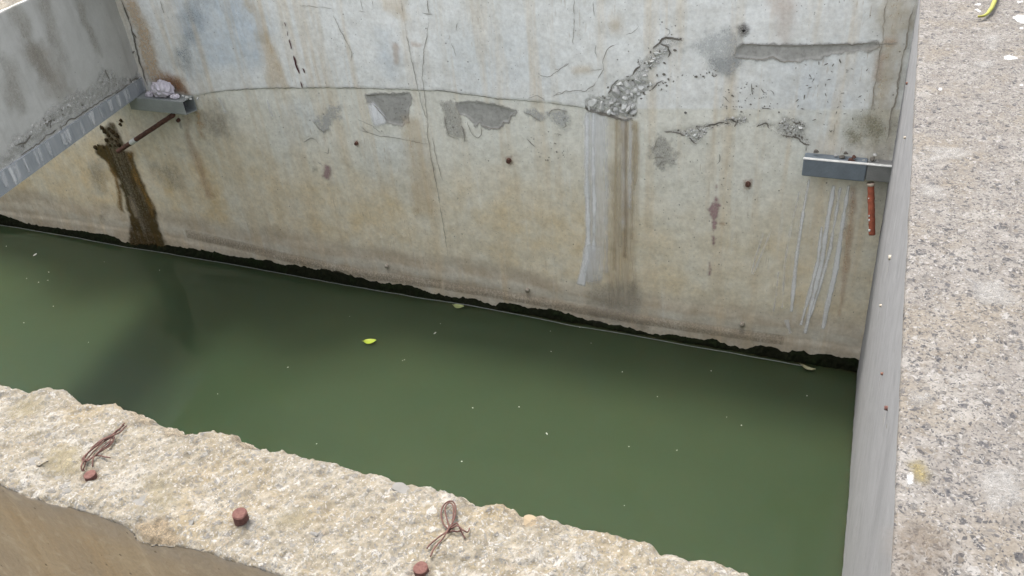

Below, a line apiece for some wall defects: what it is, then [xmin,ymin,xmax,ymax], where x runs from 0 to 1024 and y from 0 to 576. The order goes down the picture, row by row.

rust [116,113,176,153]
spalling [365,92,412,127]
crack [205,1,639,253]
spalling [441,98,567,161]
spalling [602,48,717,121]
peeling [676,40,891,144]
leakage [577,113,637,305]
rust [866,181,875,236]
leakage [787,180,853,333]